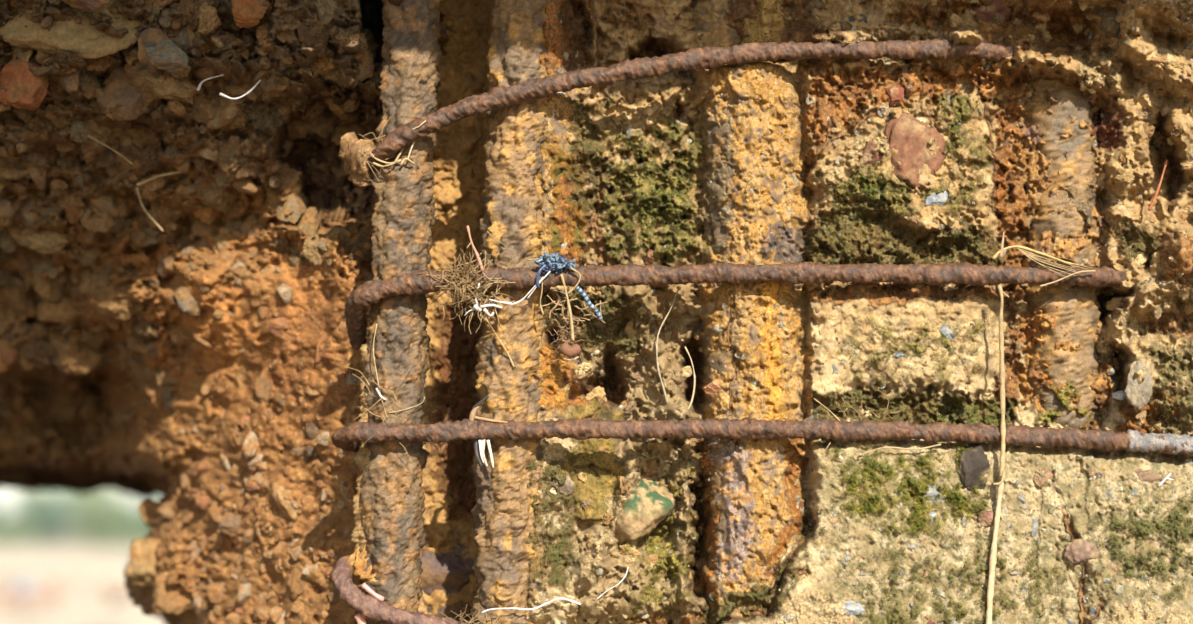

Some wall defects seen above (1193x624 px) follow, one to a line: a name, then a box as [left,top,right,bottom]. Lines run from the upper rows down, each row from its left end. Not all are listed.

spalling [629,36,682,60]
rust [536,88,593,263]
rust [698,0,1126,268]
rust [534,292,599,419]
spalling [566,347,626,421]
spalling [682,337,708,412]
rust [690,281,1183,434]
spalling [1107,345,1130,400]
rust [346,442,377,592]
peeling [559,438,626,533]
spalling [687,479,710,598]
rust [697,437,817,601]